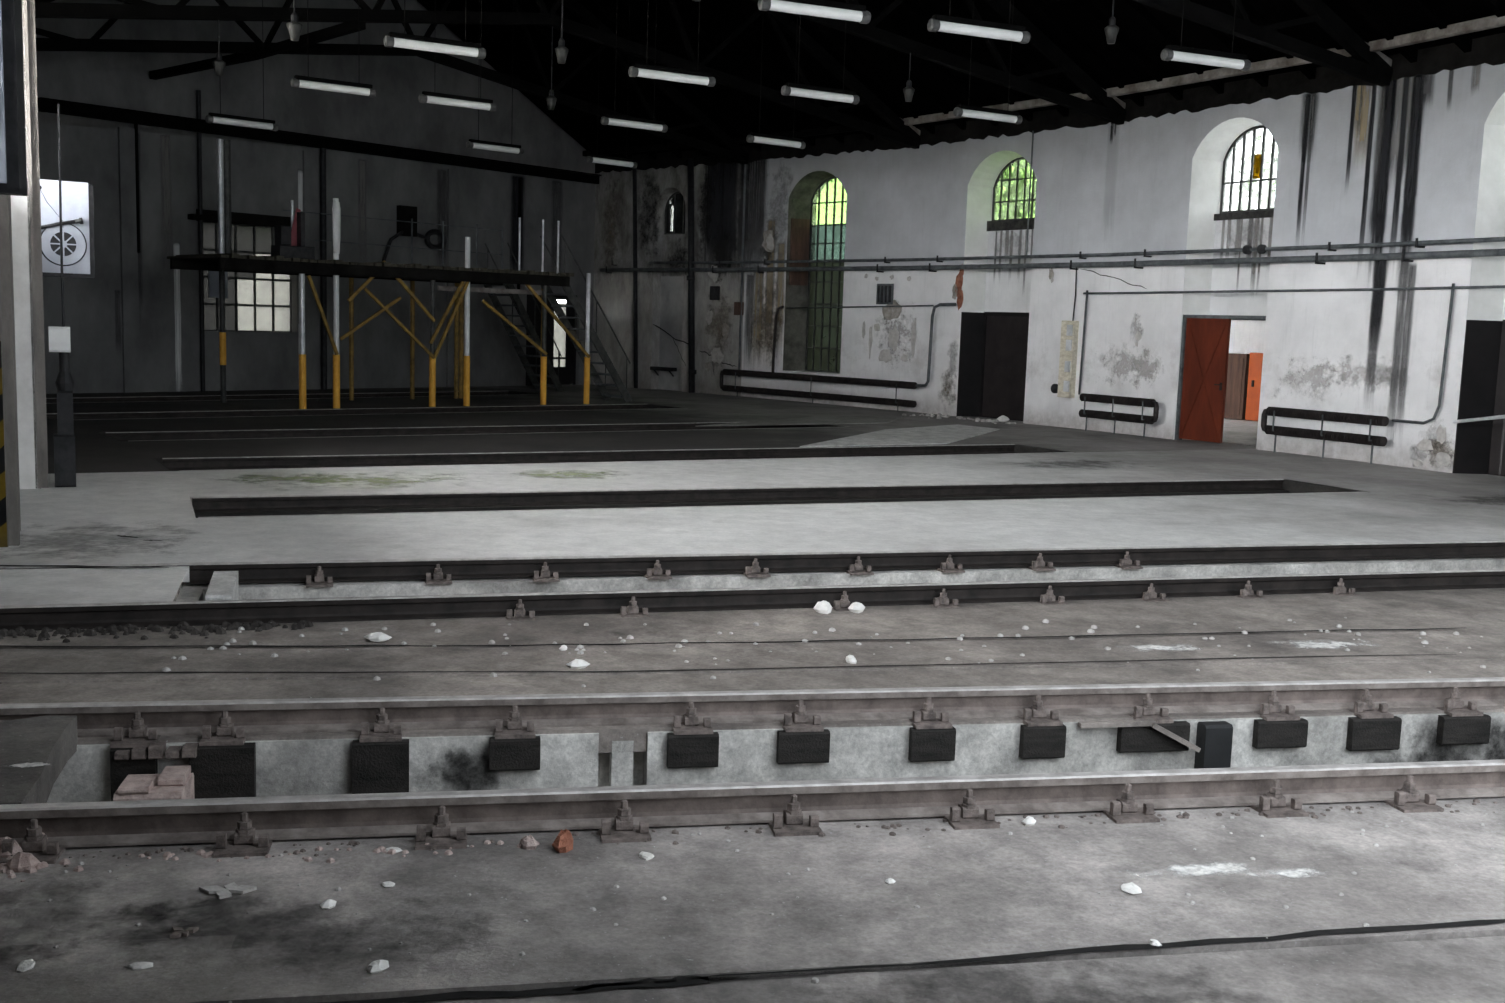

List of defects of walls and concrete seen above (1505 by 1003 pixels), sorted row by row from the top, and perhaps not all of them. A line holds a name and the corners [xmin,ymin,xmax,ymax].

water stain [638,159,781,274]
water stain [1220,217,1273,279]
water stain [1297,93,1318,229]
water stain [1342,70,1454,409]
peeling [862,300,916,363]